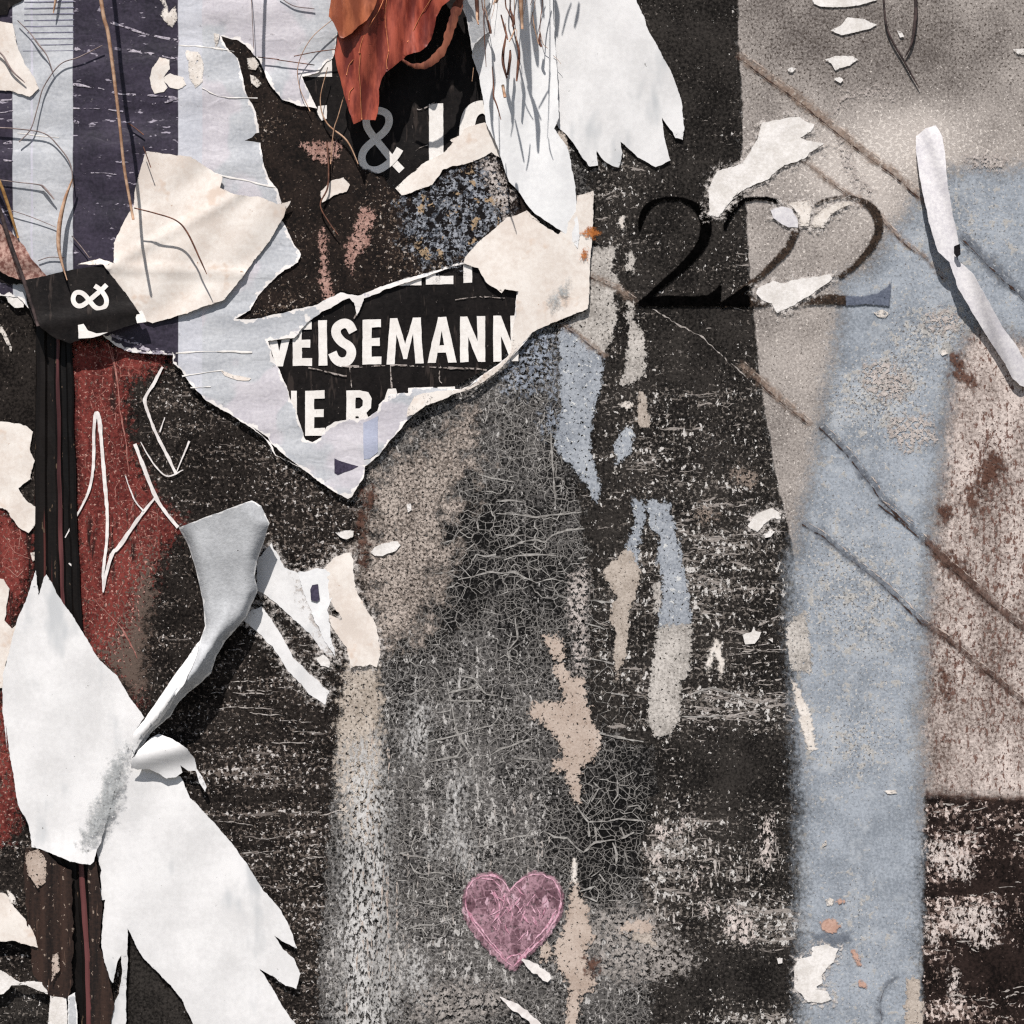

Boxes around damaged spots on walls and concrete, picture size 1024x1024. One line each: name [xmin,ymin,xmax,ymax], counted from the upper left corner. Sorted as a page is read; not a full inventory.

peeling [700,110,873,234]
spalling [391,156,519,277]
peeling [750,268,838,320]
corrosion [948,352,978,396]
corrosion [936,451,1007,526]
corrosion [927,541,976,585]
crack [384,360,650,936]
spalling [528,562,603,805]
crack [682,687,793,721]
corrosion [939,666,955,711]
peeling [0,890,38,948]
peeling [0,953,78,1024]